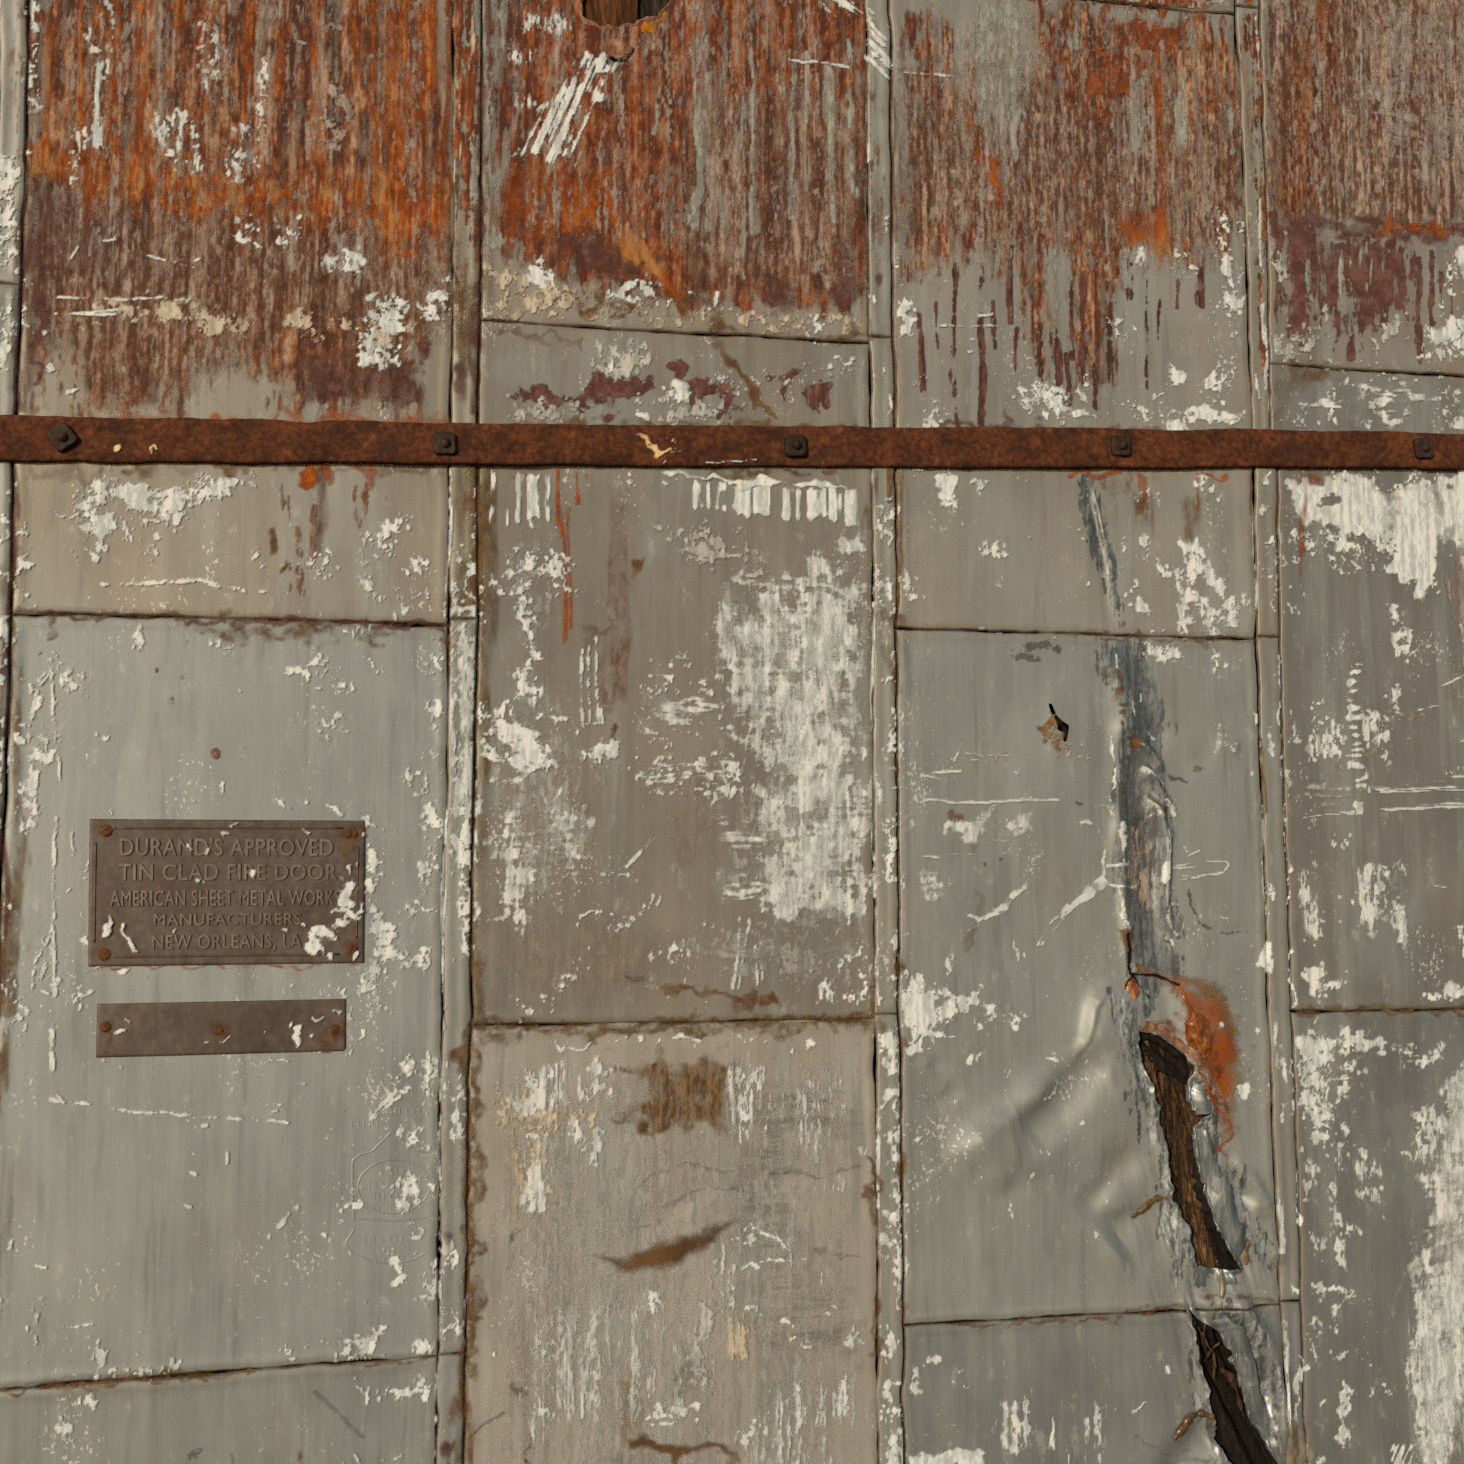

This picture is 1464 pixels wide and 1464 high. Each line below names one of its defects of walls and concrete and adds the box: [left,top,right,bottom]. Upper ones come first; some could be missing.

peeling [483,221,862,381]
corrosion [15,0,1464,427]
peeling [634,355,855,425]
corrosion [1069,469,1147,514]
peeling [1078,468,1464,717]
corrosion [469,678,489,776]
peeling [268,468,1031,1464]
corrosion [736,992,874,1037]
corrosion [1167,979,1241,1164]
peeling [1237,604,1444,1269]
corrosion [444,914,733,1464]
peeling [1284,1281,1356,1422]